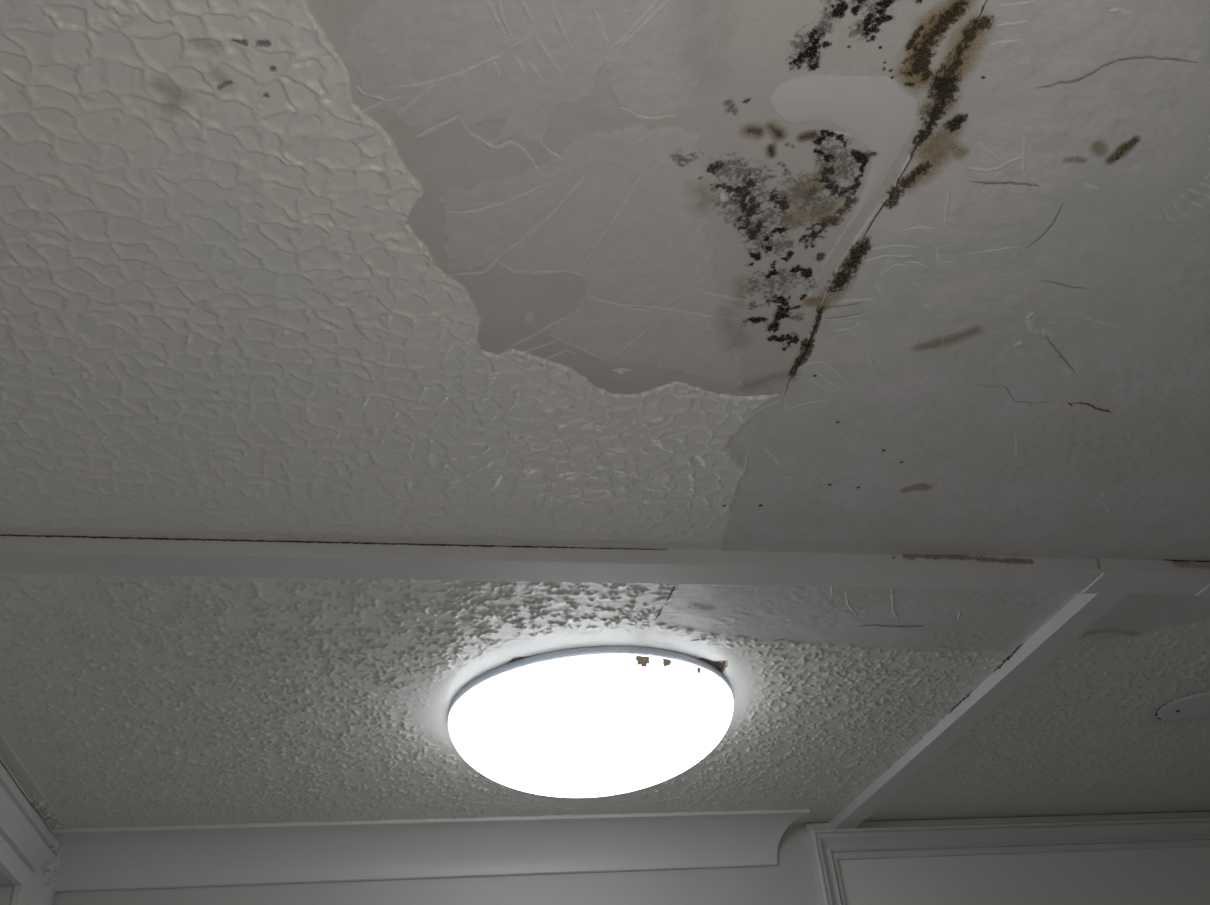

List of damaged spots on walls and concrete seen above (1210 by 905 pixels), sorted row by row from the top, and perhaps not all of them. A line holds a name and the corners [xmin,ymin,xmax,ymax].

peeling [305,0,983,396]
water stain [671,130,871,351]
water stain [789,0,993,209]
crack [861,126,929,243]
crack [961,0,987,51]
crack [784,300,862,395]